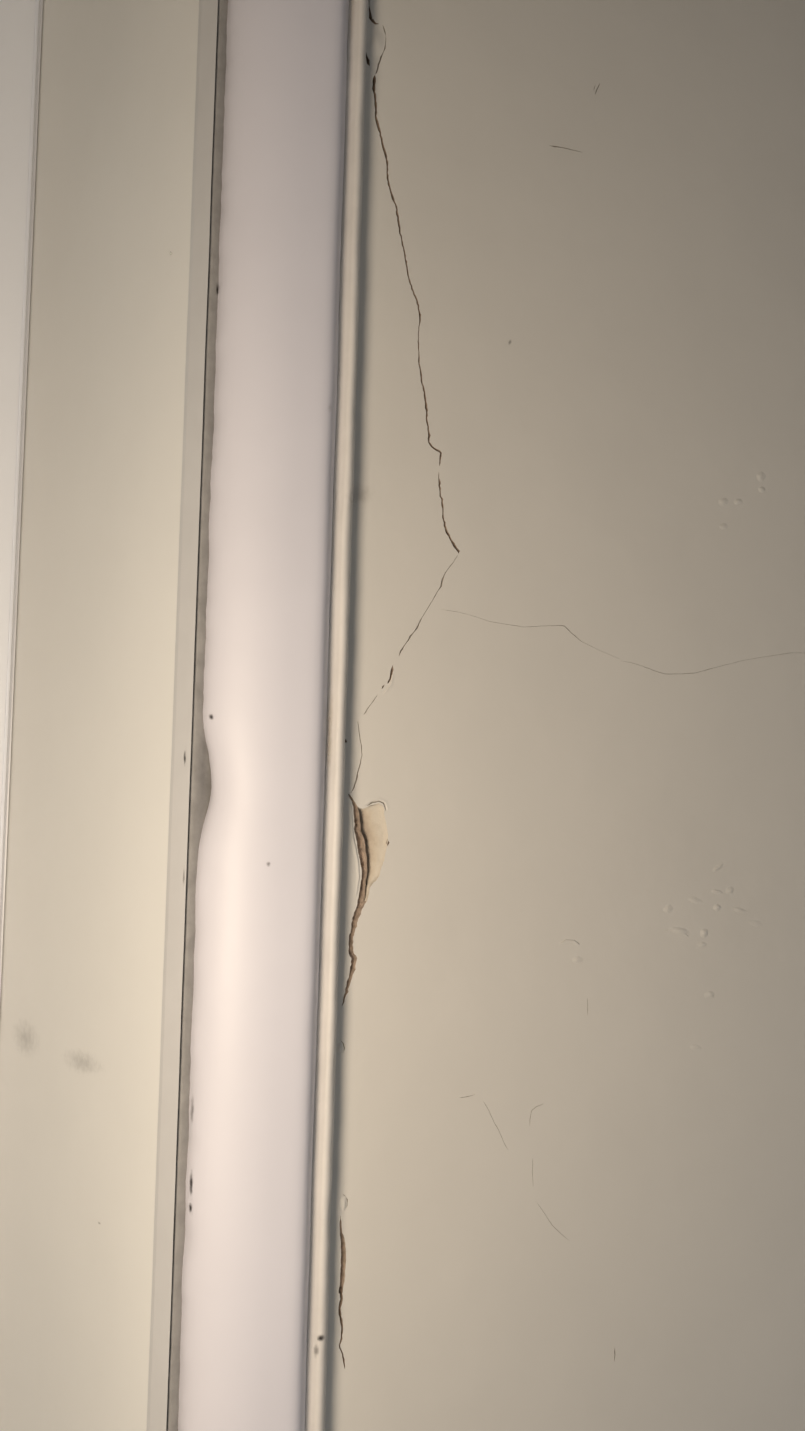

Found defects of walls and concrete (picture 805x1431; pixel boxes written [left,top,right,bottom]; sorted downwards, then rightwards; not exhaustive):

crack [351,76,787,792]
flaking render [345,794,389,902]
crack [342,901,367,1005]
crack [338,1216,346,1368]